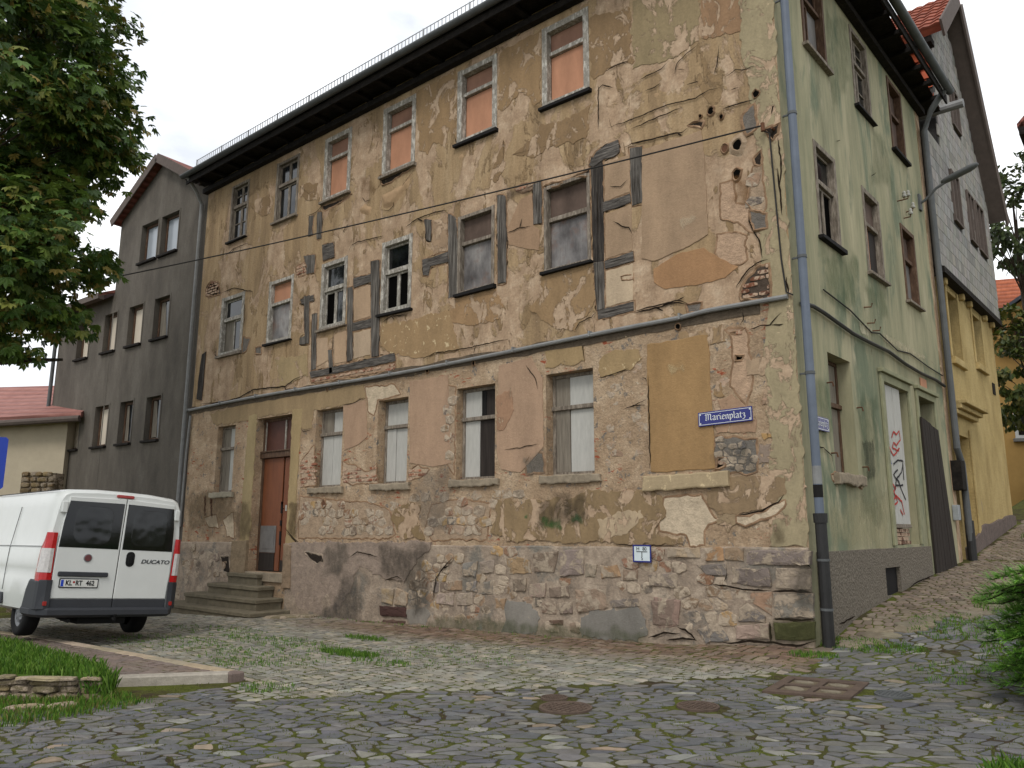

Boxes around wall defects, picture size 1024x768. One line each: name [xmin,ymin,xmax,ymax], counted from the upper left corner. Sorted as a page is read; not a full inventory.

peeling [497,30,542,111]
peeling [490,104,591,183]
crack [597,46,773,148]
spalling [687,119,706,130]
spalling [714,102,781,302]
peeling [529,263,596,332]
peeling [285,324,787,614]
crack [741,496,783,515]